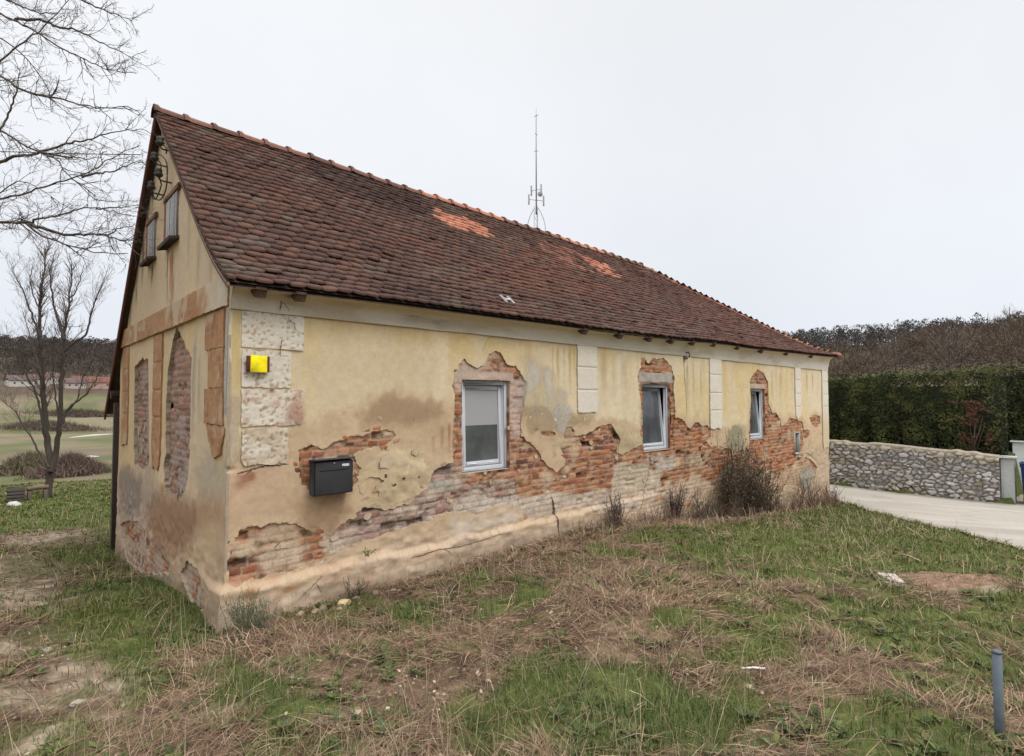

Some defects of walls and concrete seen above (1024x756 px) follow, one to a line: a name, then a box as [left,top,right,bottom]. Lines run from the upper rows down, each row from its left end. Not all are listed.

flaking render [137,360,149,469]
flaking render [168,333,192,502]
flaking render [225,351,820,587]
flaking render [184,561,205,609]